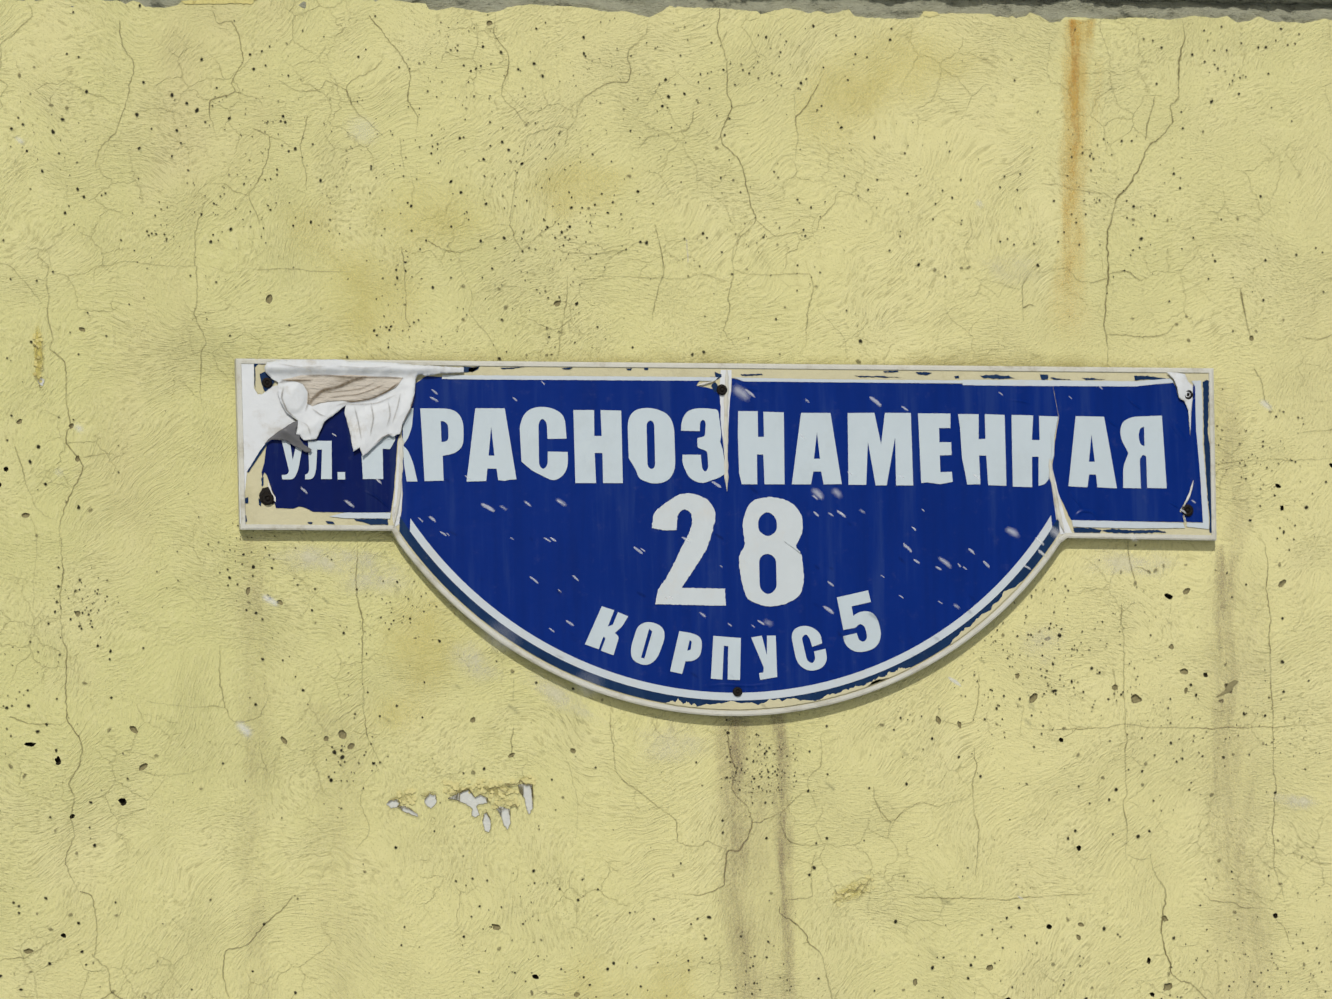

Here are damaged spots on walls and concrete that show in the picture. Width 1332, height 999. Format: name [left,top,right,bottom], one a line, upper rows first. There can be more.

crack [1099,102,1173,337]
peeling [386,771,536,832]
crack [1161,900,1207,999]